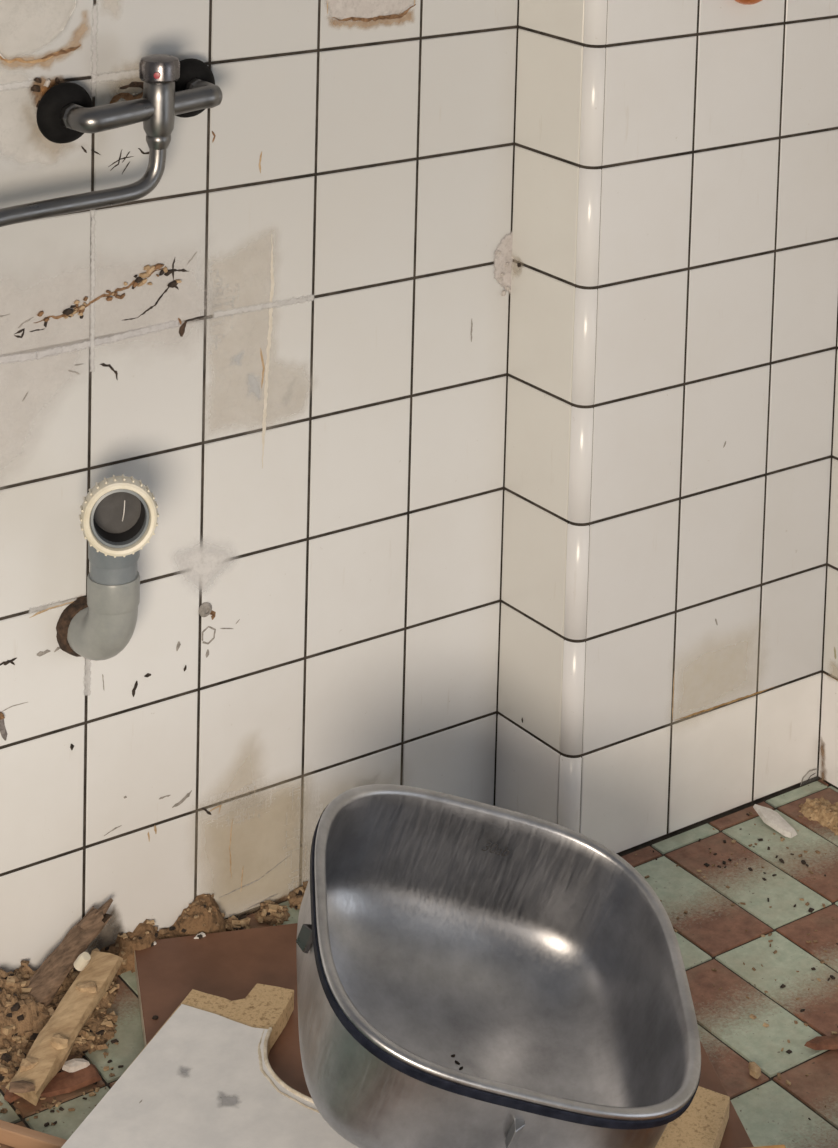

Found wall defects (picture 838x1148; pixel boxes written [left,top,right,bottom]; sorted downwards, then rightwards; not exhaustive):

peeling [326,0,416,27]